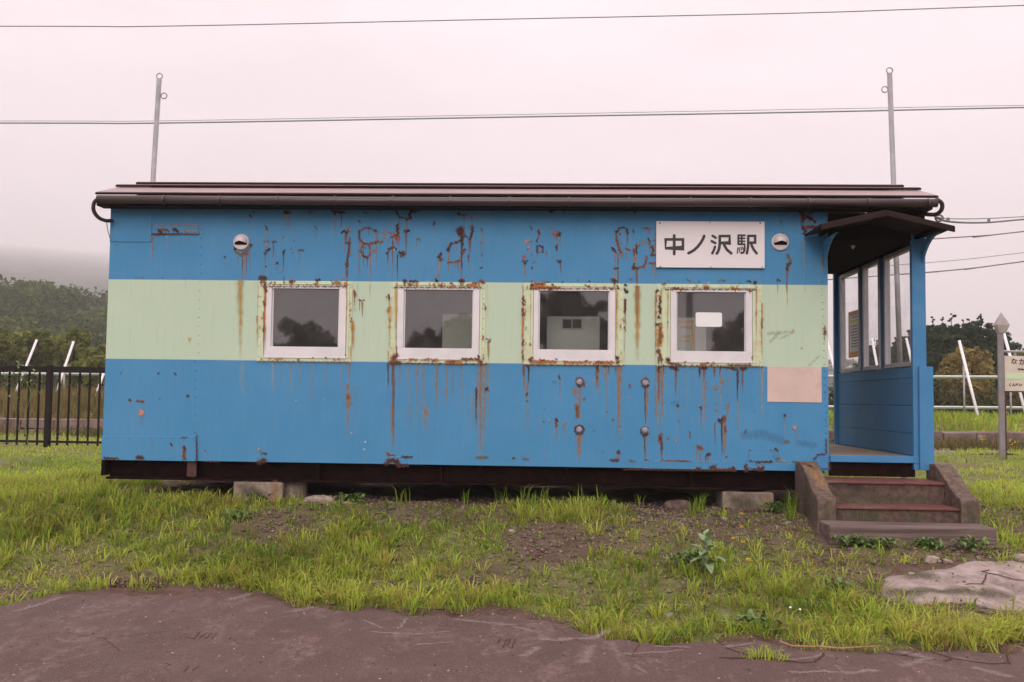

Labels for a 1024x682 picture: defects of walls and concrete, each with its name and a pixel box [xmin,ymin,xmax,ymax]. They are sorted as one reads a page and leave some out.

rust [151,224,201,250]
rust [233,210,491,438]
rust [384,452,413,467]
rust [521,226,772,472]